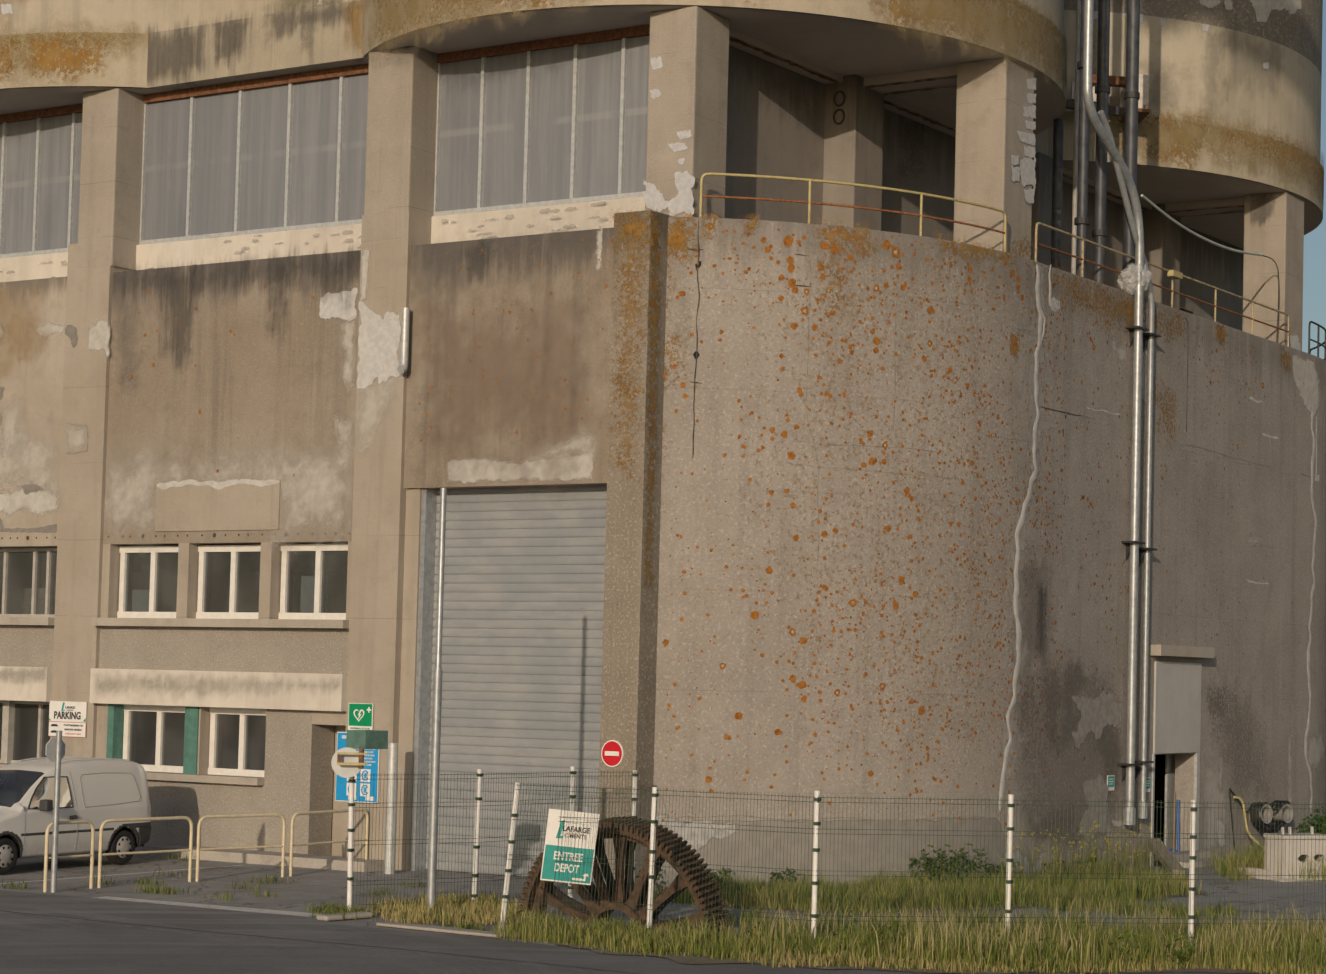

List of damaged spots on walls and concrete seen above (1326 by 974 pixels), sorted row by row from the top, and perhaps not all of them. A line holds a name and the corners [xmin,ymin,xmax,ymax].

peeling [0,484,57,533]
crack [654,219,1094,825]
peeling [1072,690,1122,750]
peeling [1076,774,1125,843]